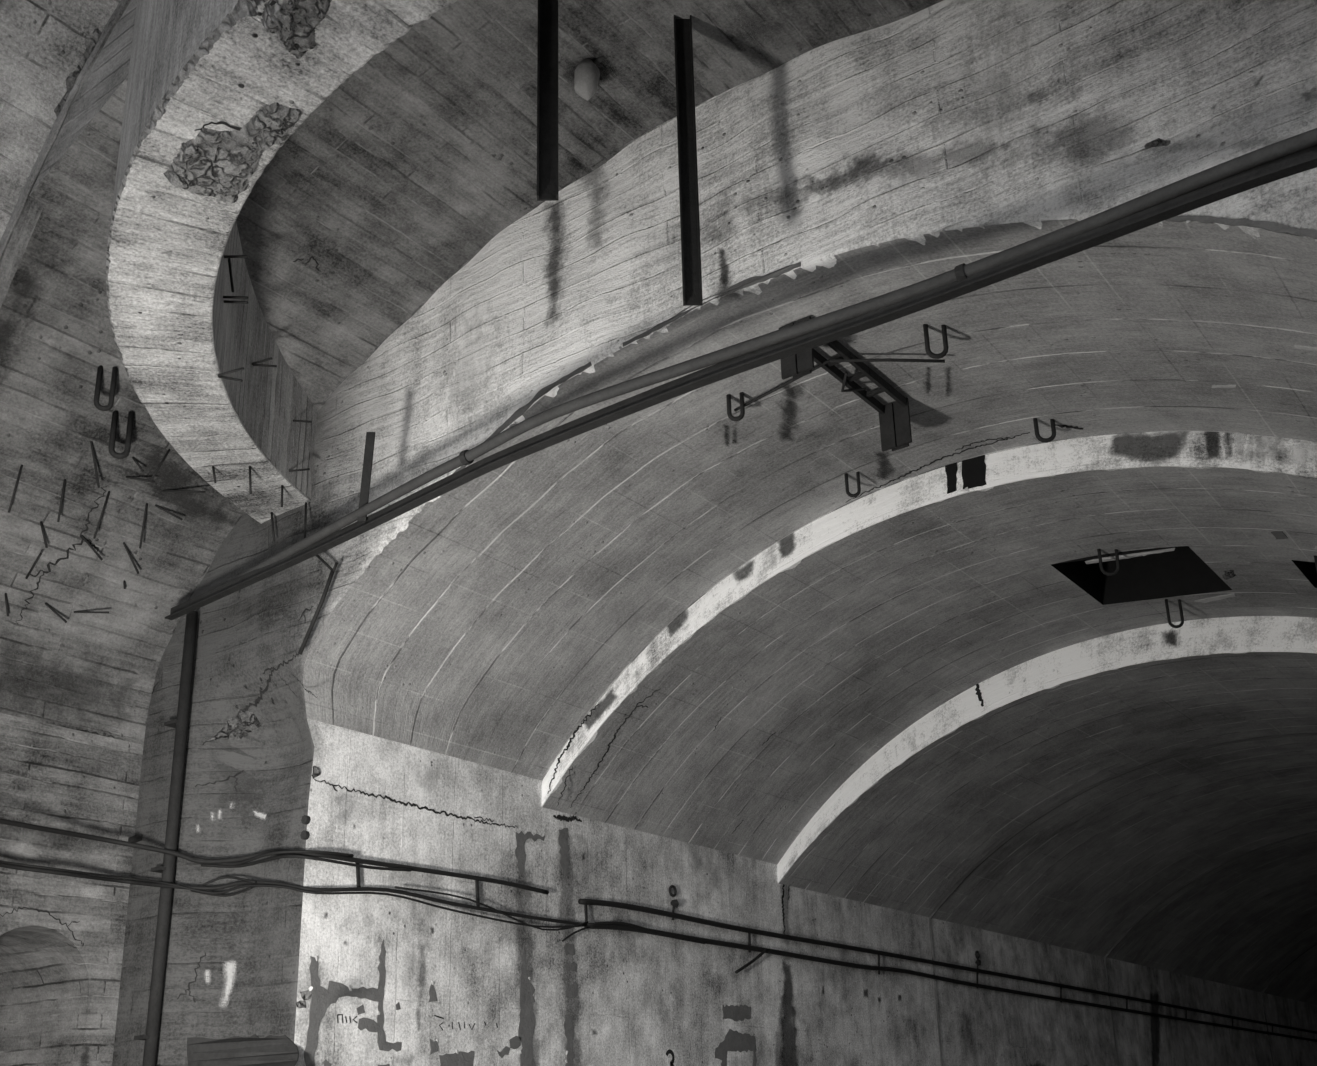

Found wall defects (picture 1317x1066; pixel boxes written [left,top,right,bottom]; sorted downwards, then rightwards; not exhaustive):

spalling [261,0,332,59]
spalling [163,103,303,204]
water stain [546,203,562,319]
crack [18,486,107,621]
crack [203,653,318,745]
crack [195,761,267,791]
crack [312,775,518,828]
peeling [515,828,570,876]
crack [548,688,661,822]
peeling [296,939,402,1066]
peeling [430,1039,475,1066]
peeling [497,946,536,1066]